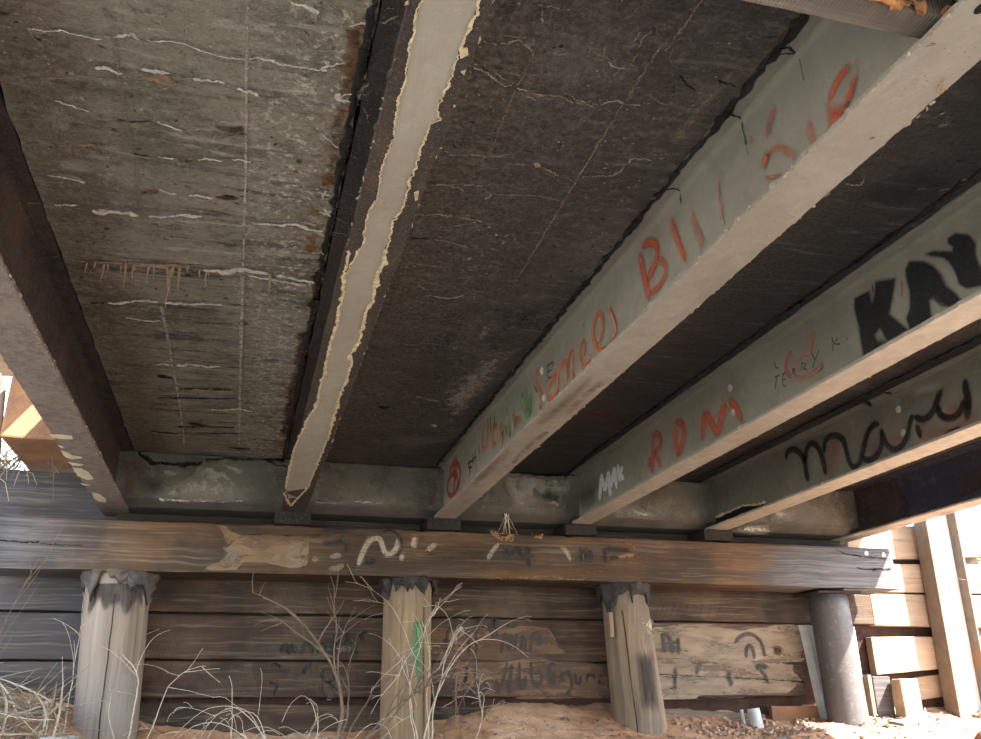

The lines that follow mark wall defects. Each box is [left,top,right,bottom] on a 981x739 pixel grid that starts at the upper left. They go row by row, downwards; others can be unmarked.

crack [0,0,346,164]
damp [290,31,369,119]
damp [290,0,398,28]
crack [469,34,736,112]
crack [27,171,345,235]
peeling [138,0,493,510]
crack [403,151,668,299]
crack [98,603,115,739]